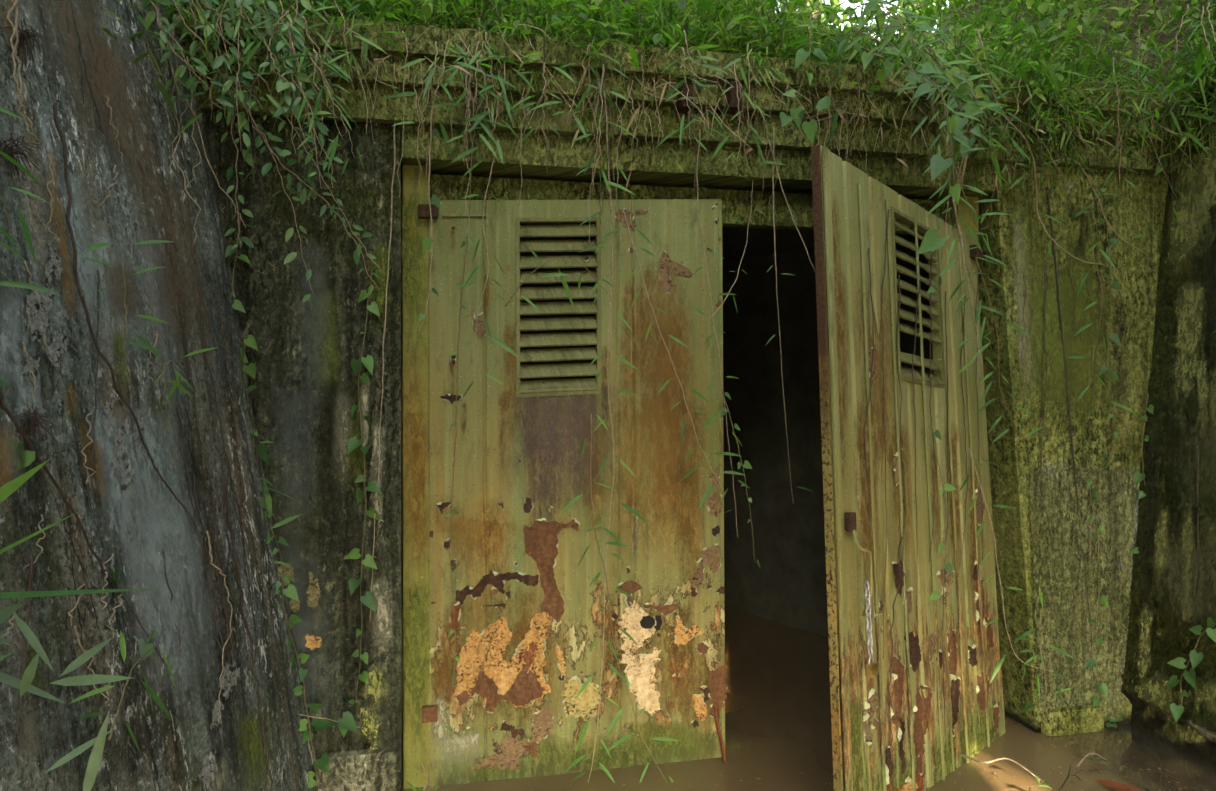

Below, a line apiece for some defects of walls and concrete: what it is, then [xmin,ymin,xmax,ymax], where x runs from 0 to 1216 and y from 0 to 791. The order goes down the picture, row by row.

damp [1168,114,1216,498]
damp [327,383,383,532]
rust [440,392,465,432]
peeling [429,531,457,571]
peeling [690,467,725,597]
damp [1118,443,1216,619]
peeling [450,561,601,773]
peeling [611,599,704,716]
peeling [691,664,728,729]